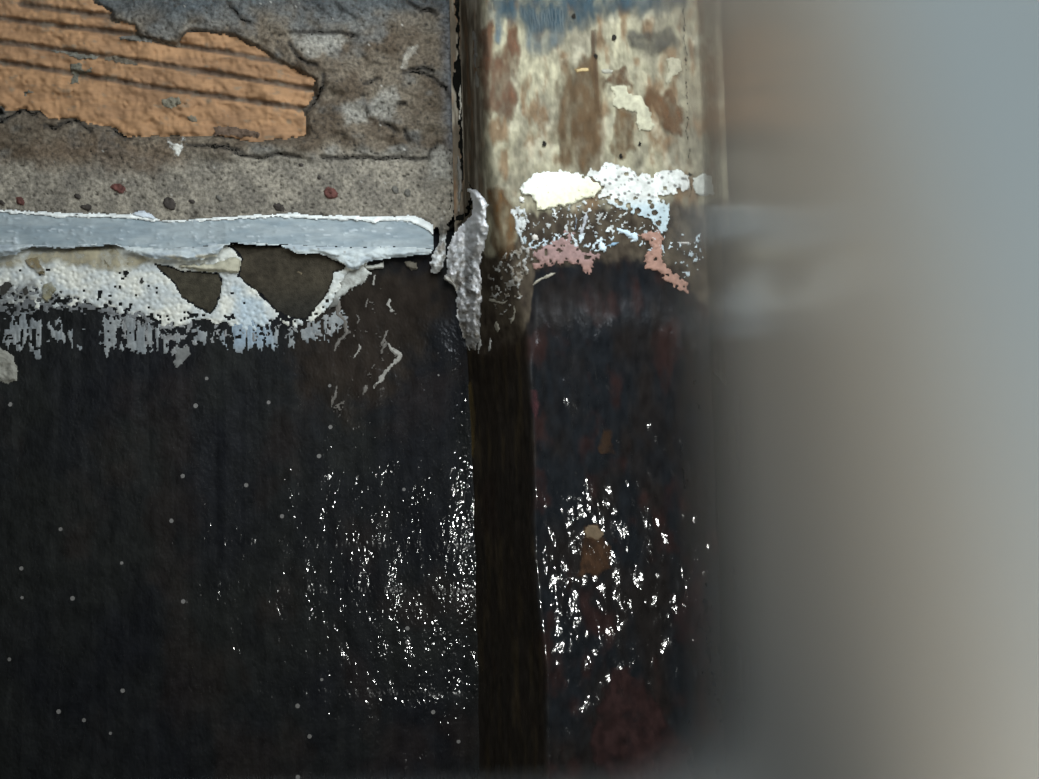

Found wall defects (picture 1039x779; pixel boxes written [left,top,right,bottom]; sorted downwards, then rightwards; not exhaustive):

damp [495,0,677,52]
flaking render [0,0,454,368]
peeling [520,154,703,294]